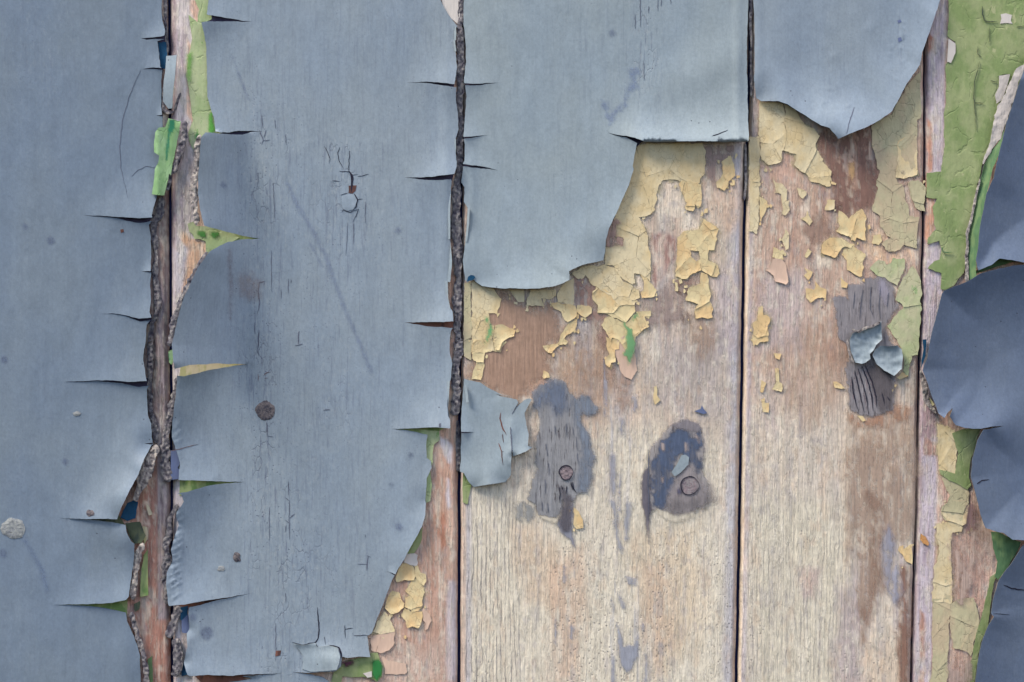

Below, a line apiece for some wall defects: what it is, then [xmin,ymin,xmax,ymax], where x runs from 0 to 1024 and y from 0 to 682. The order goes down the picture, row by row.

peeling [0,0,458,682]
peeling [570,508,583,531]
peeling [460,0,940,487]
peeling [898,71,1024,682]